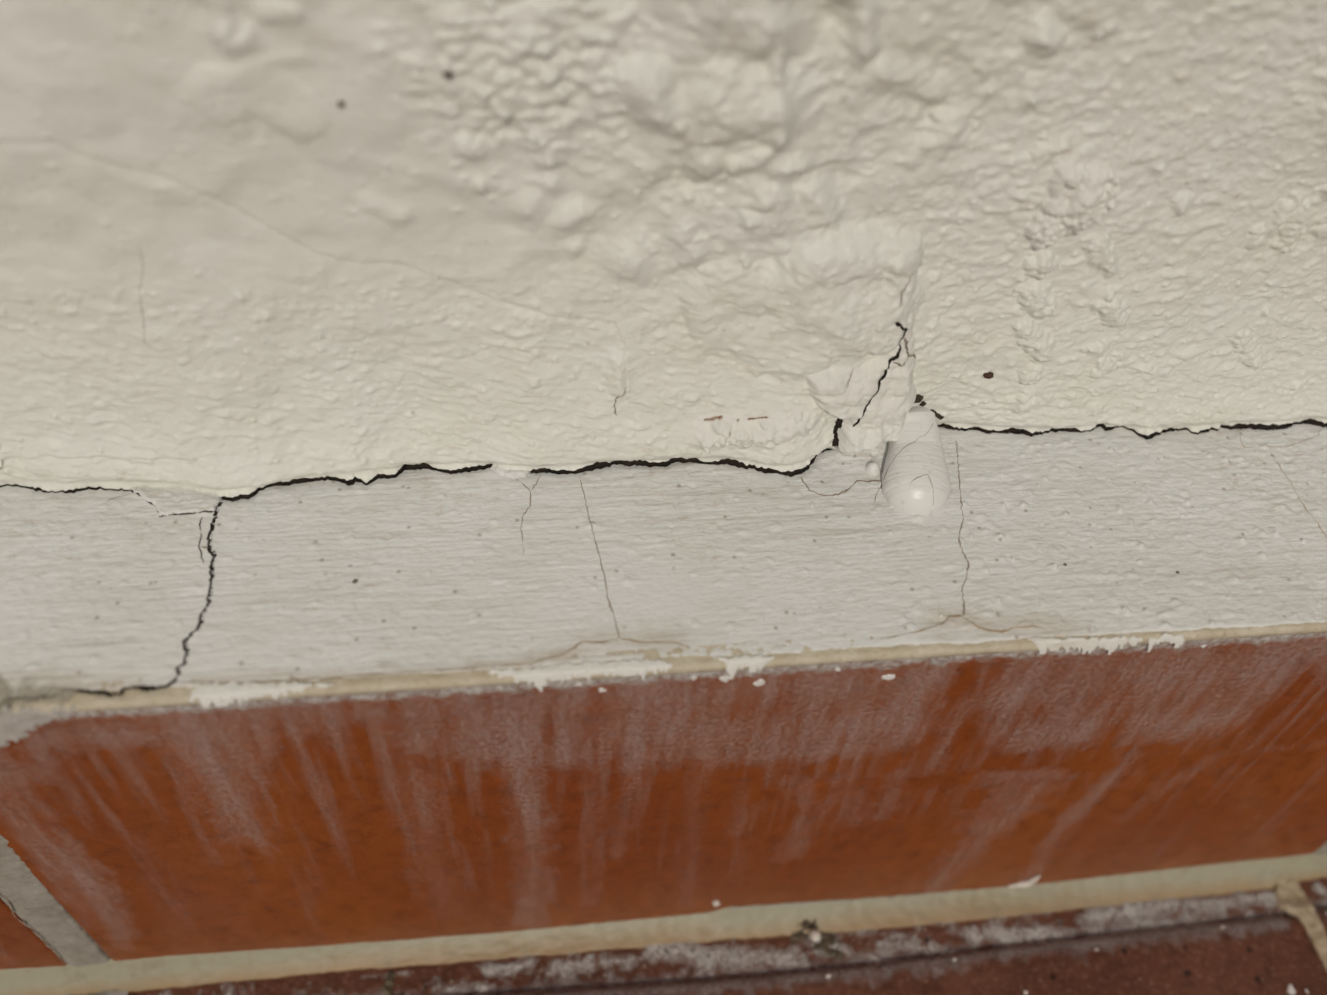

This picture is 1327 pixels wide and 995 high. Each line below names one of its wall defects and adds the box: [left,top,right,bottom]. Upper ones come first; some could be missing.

crack [0,275,1327,703]
efflorescence [56,633,1327,719]